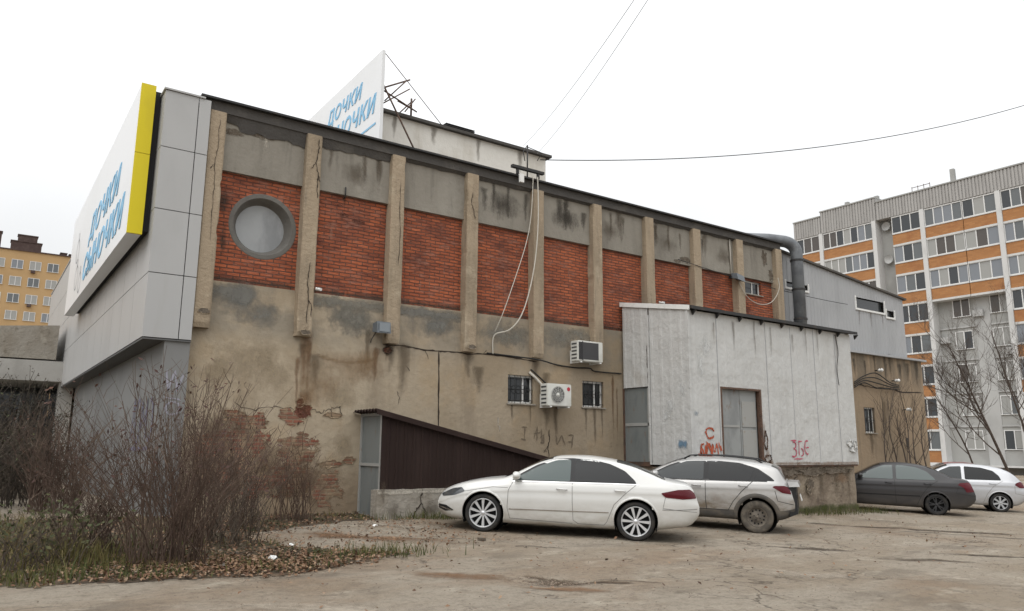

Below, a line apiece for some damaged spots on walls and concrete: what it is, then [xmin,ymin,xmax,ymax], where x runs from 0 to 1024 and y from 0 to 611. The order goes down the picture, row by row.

crack [210,120,221,238]
crack [312,139,320,198]
crack [305,265,313,323]
flaking render [192,397,356,510]